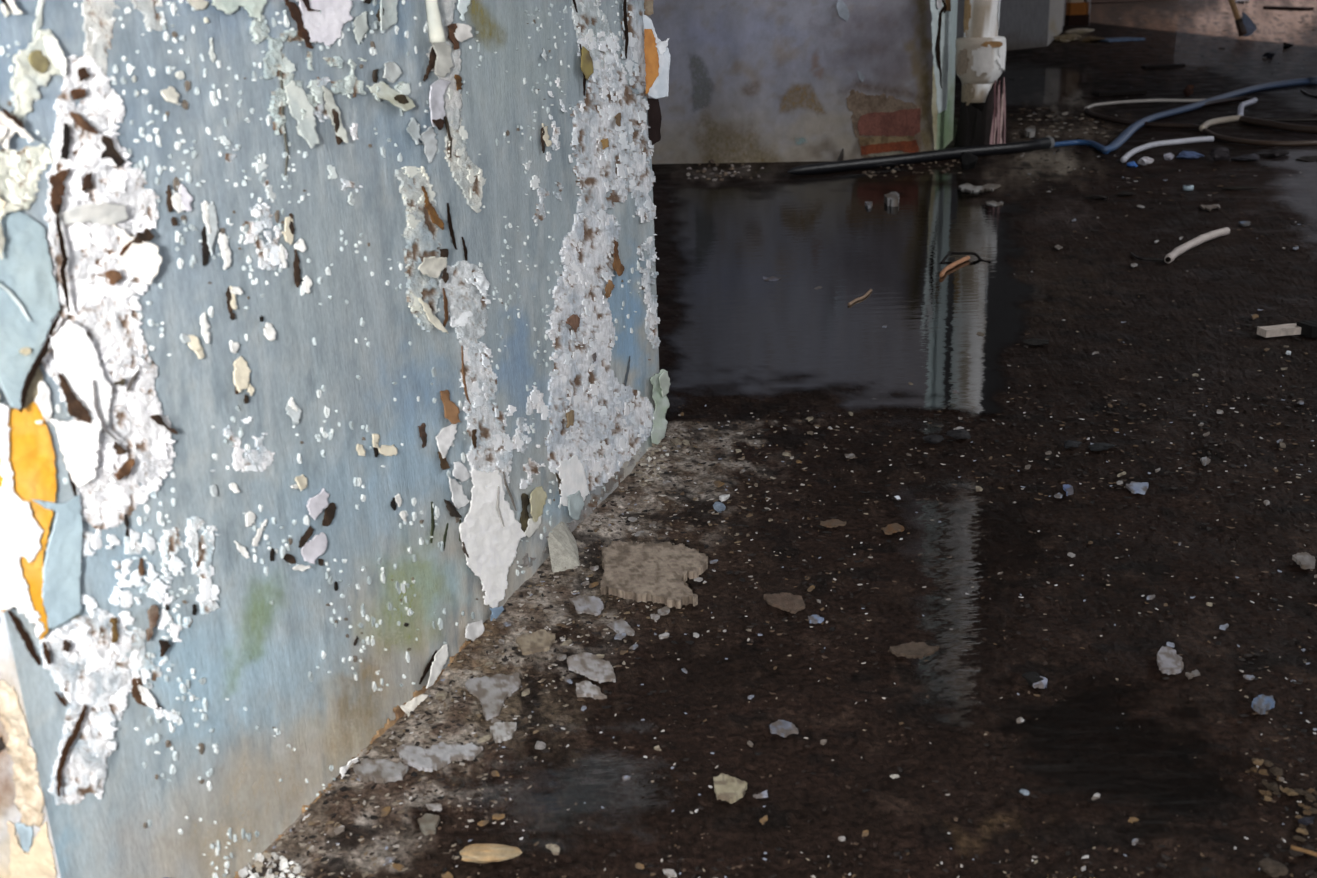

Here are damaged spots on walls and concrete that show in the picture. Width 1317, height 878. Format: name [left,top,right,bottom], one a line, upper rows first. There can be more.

flaking render [846,0,1006,158]
peeling [187,0,671,572]
peeling [0,0,313,878]
peeling [516,629,555,655]
peeling [569,595,635,636]
peeling [465,672,521,744]
peeling [576,680,607,699]
peeling [418,813,440,835]